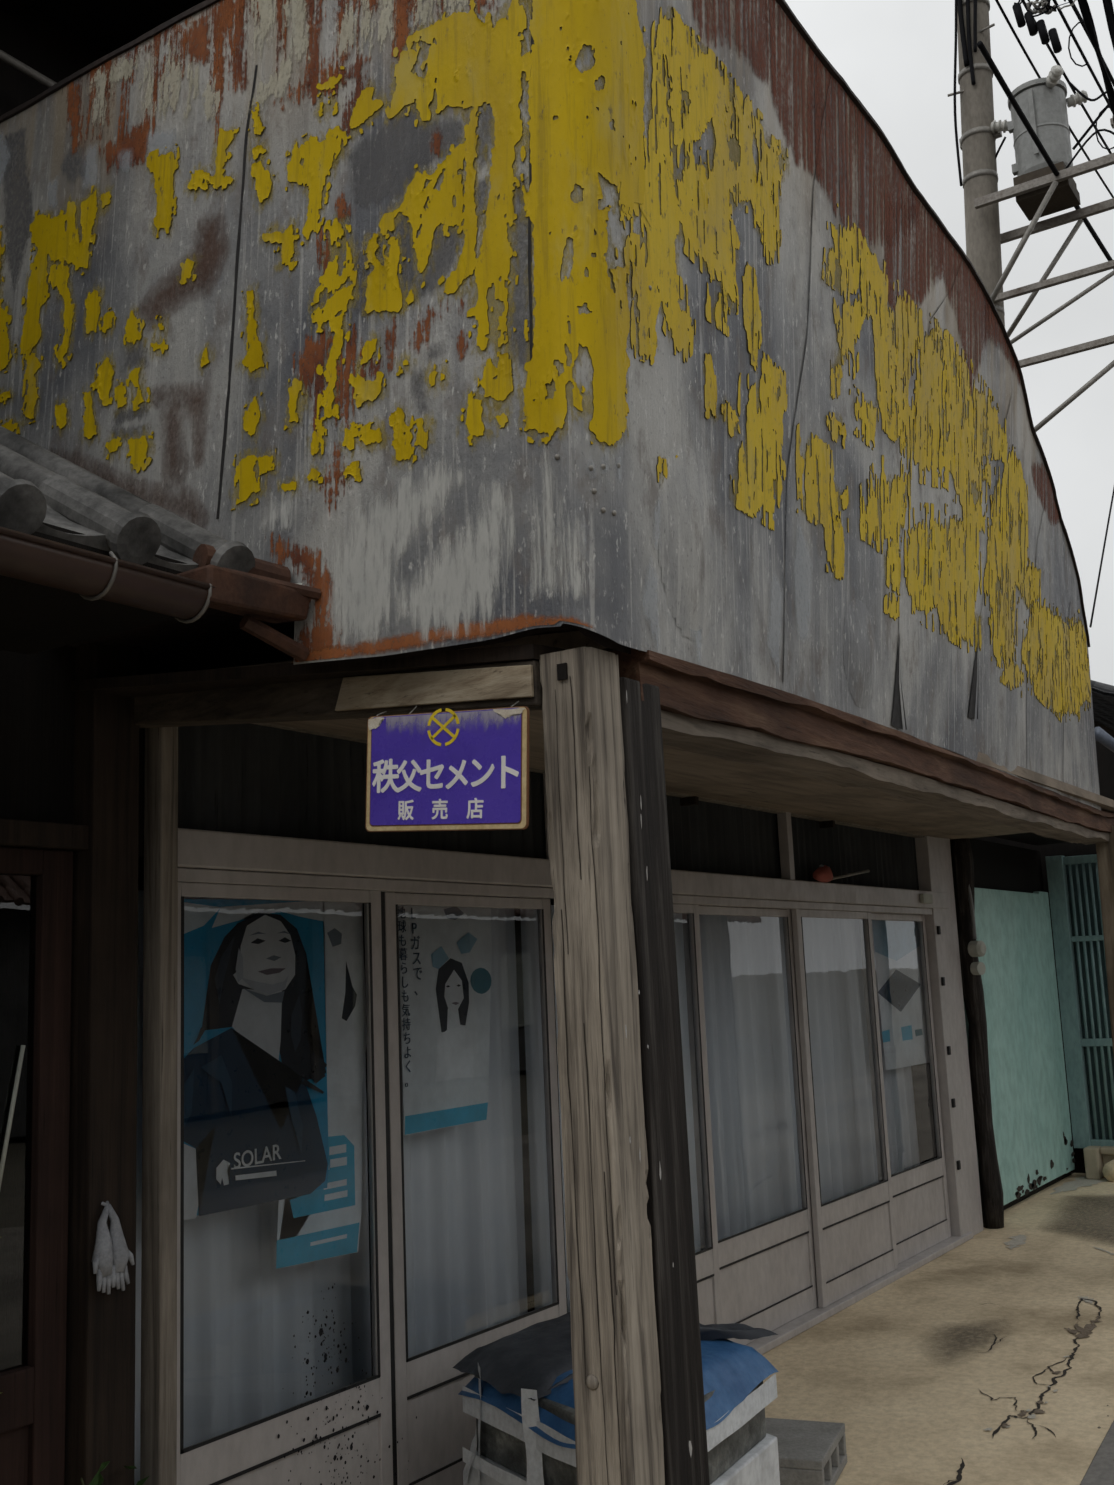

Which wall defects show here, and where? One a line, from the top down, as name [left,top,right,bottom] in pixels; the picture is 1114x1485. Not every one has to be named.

rust [62,0,419,173]
peeling [0,185,169,474]
peeling [89,0,1091,723]
rust [270,532,592,663]
peeling [368,717,384,730]
crack [980,1338,1080,1439]
crack [943,1458,965,1485]